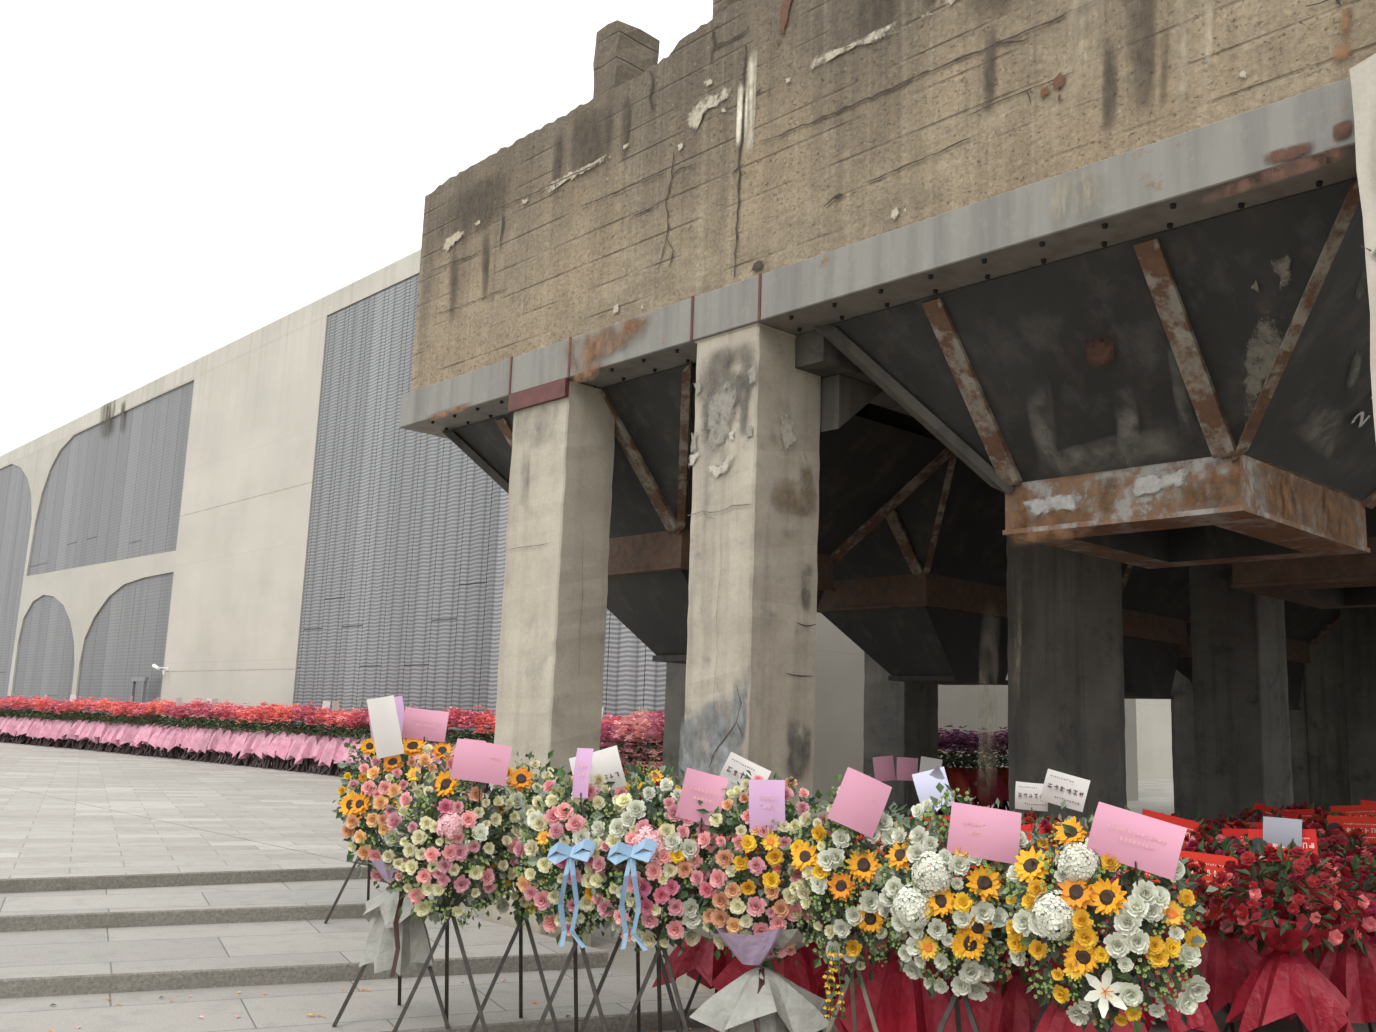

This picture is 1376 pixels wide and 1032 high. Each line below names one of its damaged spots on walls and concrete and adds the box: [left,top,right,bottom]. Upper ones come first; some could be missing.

peeling [811,25,891,69]
damp [552,102,630,181]
spalling [688,79,730,129]
crack [711,0,1096,277]
damp [447,180,502,289]
crack [432,152,695,271]
rust [569,319,642,381]
peeling [689,363,756,477]
rust [1016,481,1113,542]
rust [1175,459,1241,511]